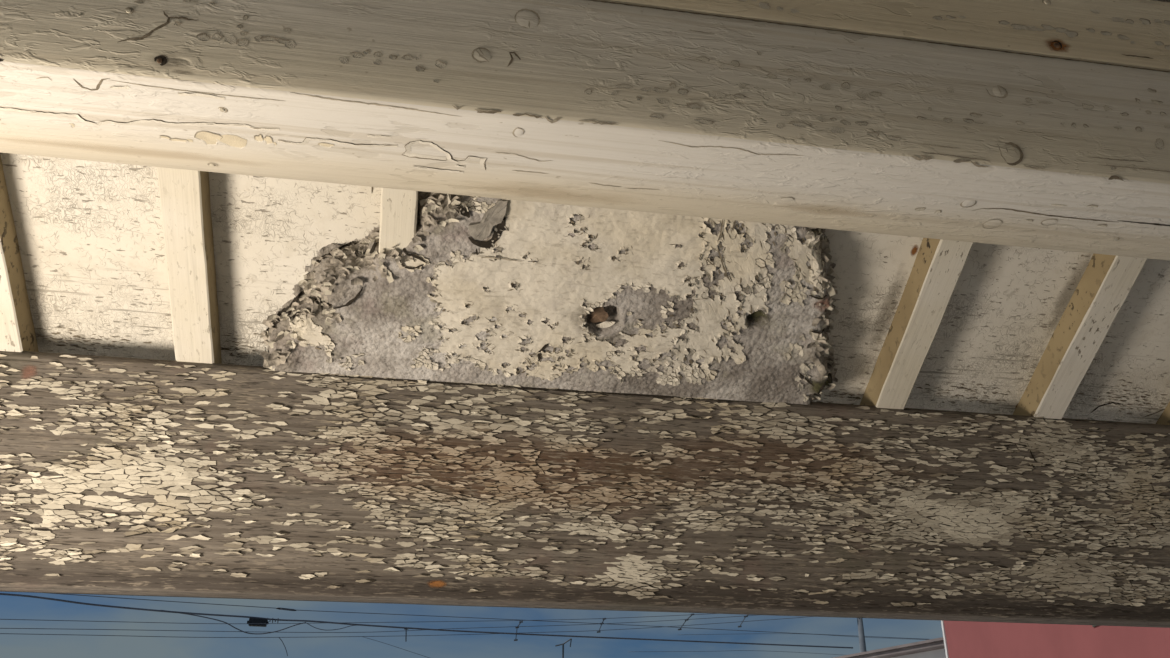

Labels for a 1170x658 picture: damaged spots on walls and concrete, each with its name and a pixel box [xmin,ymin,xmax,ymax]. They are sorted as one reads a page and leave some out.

crack [119,12,197,42]
crack [472,9,540,66]
crack [591,0,1170,72]
corrosion [1048,40,1068,51]
crack [0,59,460,117]
crack [495,128,546,174]
crack [658,140,803,156]
crack [919,142,1023,166]
crack [1091,157,1170,172]
crack [960,199,1170,229]
peeling [0,194,1170,609]